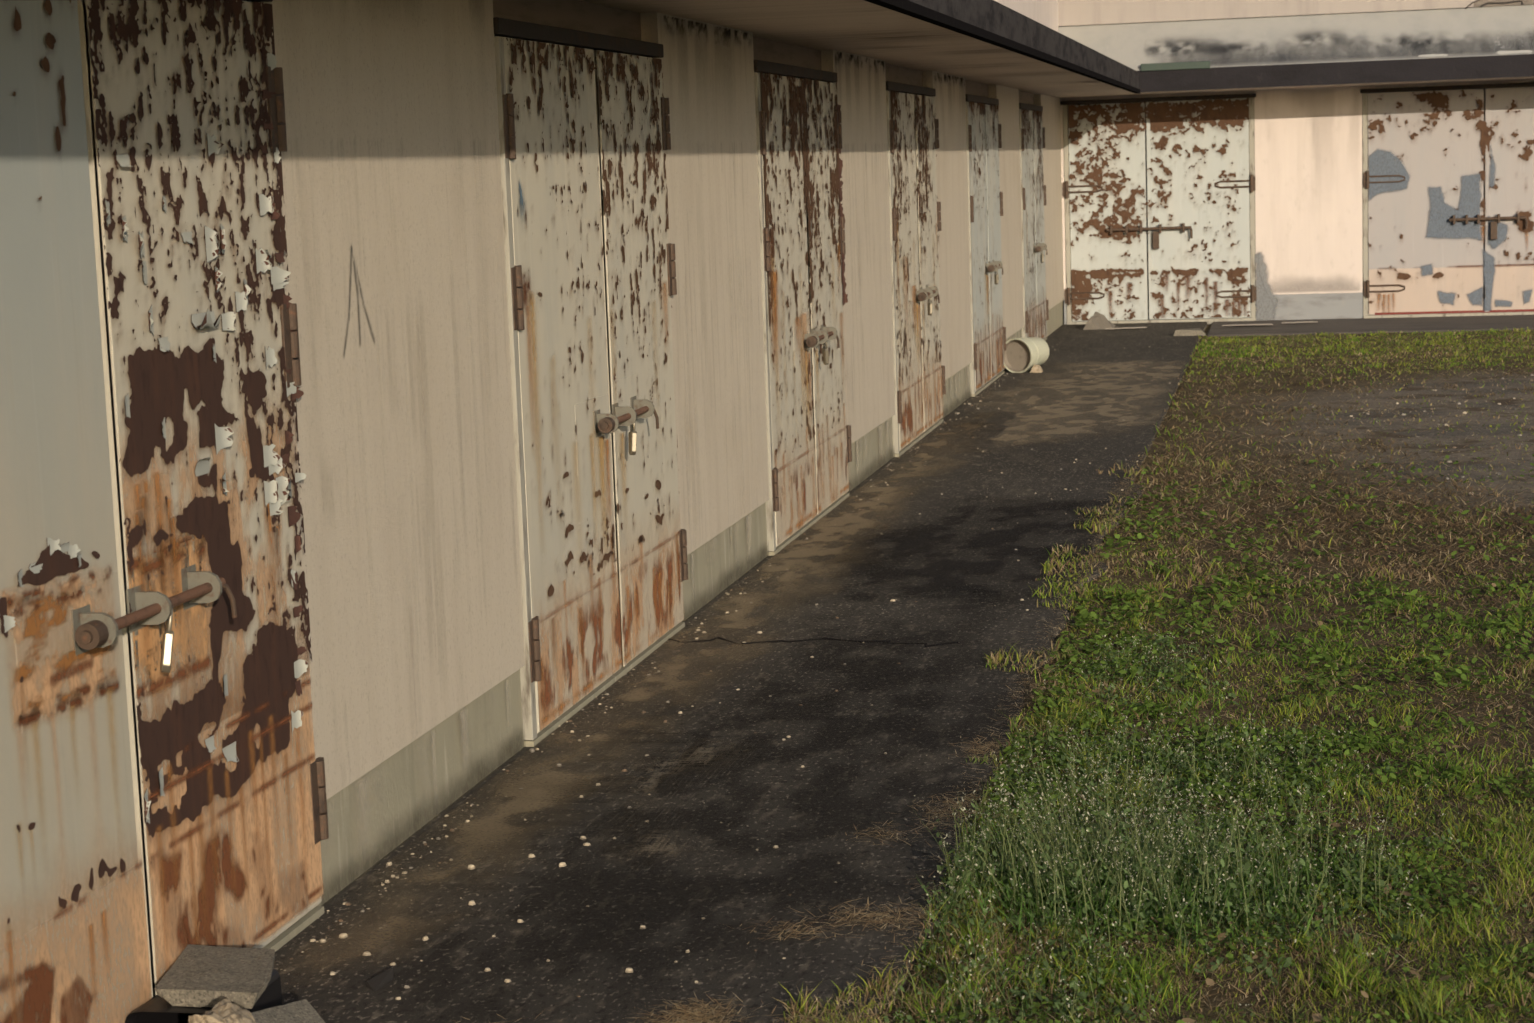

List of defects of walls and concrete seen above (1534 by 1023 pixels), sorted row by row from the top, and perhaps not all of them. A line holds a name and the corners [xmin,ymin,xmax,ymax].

water stain [1149,34,1533,65]
peeling [1368,90,1534,225]
peeling [1504,211,1534,260]
rust [1161,275,1246,316]
peeling [41,0,312,838]
rust [901,376,943,447]
rust [787,454,849,534]
peeling [0,538,100,638]
rust [538,534,680,730]
crack [668,637,958,647]
rust [0,428,323,1023]
peeling [58,858,126,909]